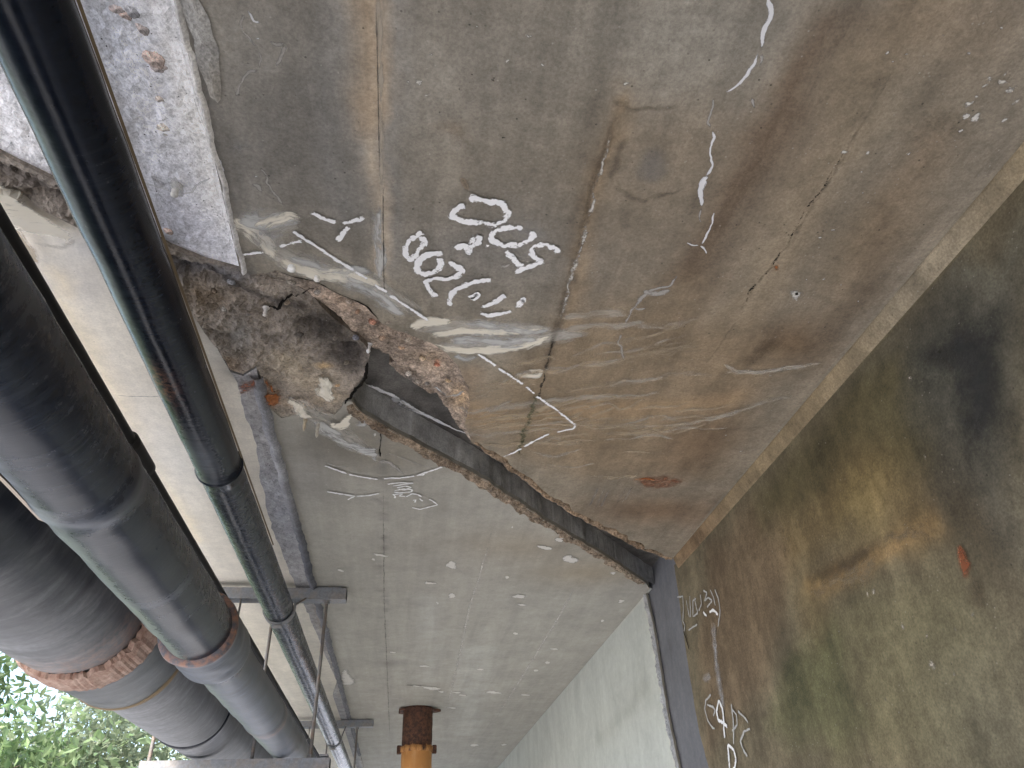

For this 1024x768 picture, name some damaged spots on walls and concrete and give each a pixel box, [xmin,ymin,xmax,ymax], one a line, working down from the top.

spalling [0,149,78,228]
crack [269,273,377,318]
leakage [410,310,640,386]
leakage [369,385,735,447]
spalling [161,228,679,768]